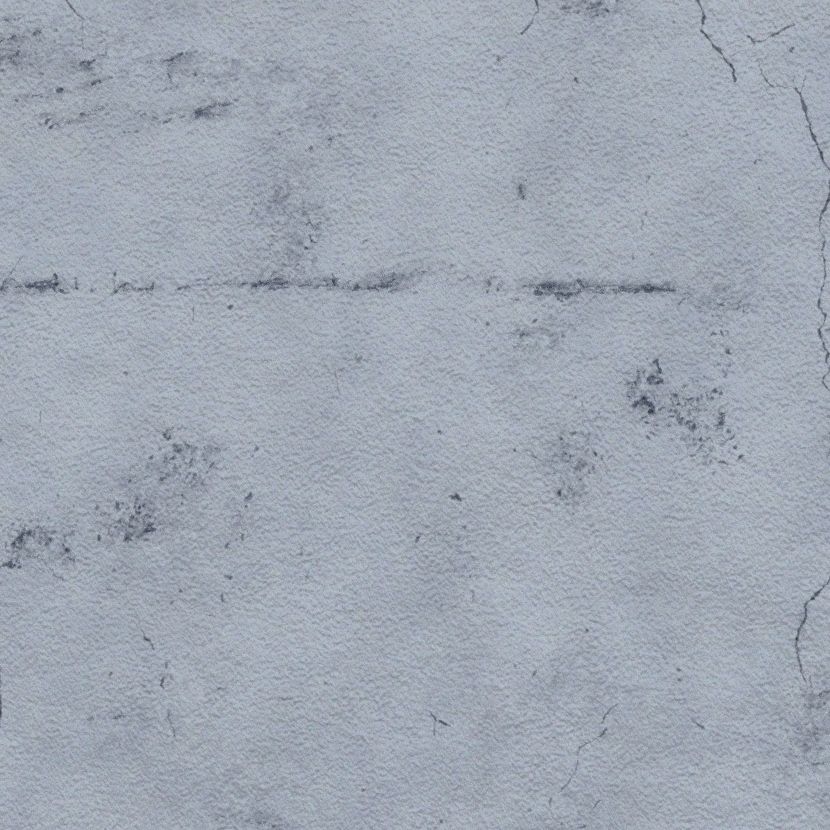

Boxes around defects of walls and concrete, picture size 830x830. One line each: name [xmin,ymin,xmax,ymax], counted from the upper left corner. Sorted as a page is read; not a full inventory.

crack [696,0,736,82]
crack [795,88,830,221]
crack [818,243,830,389]
crack [796,579,830,680]